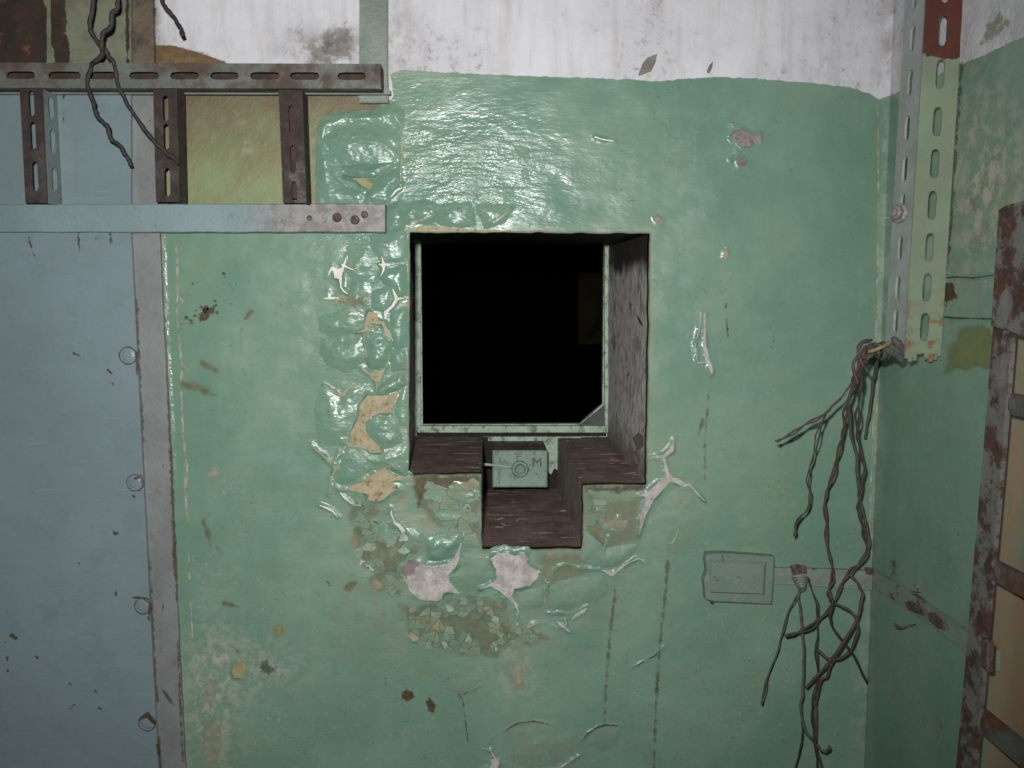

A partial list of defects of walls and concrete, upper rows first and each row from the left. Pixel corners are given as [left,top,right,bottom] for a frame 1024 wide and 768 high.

peeling [727,121,765,171]
rust [119,299,144,441]
rust [185,300,218,322]
peeling [690,307,717,378]
rust [169,449,178,601]
peeling [306,250,547,657]
peeling [586,433,709,538]
rust [905,601,946,629]
rust [133,588,184,768]